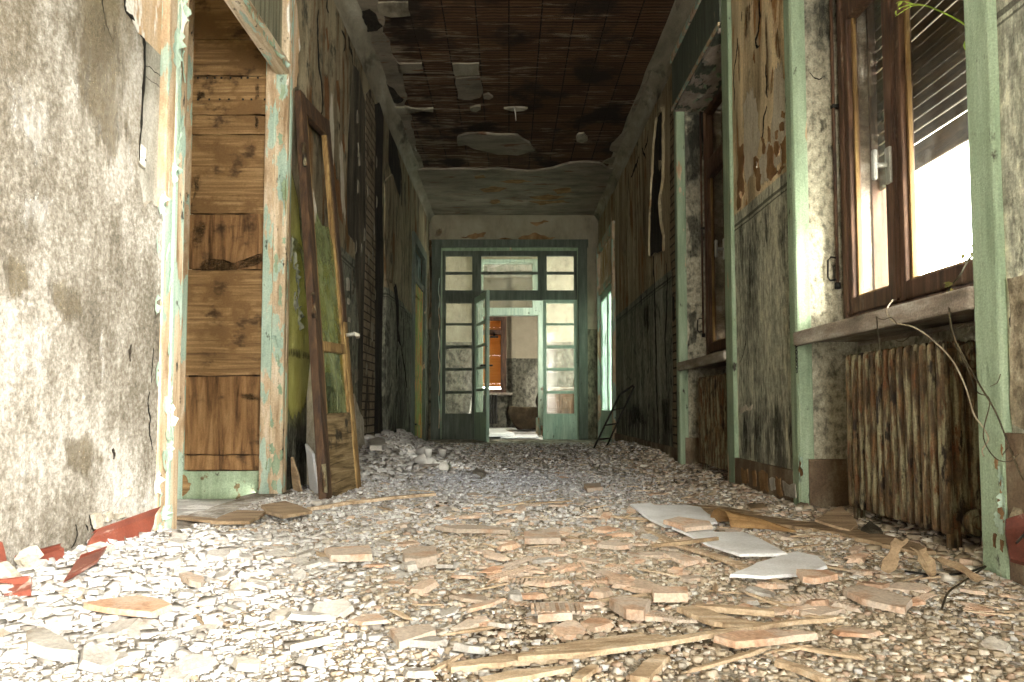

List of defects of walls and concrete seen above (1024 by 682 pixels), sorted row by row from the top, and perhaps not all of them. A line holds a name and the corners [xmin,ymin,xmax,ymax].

damp [68,9,127,165]
spalling [121,0,192,216]
peeling [736,59,786,210]
damp [8,257,28,298]
damp [52,282,82,319]
peeling [155,233,174,315]
spalling [648,105,677,448]
damp [66,434,103,473]
peeling [154,340,179,530]
damp [743,412,760,451]